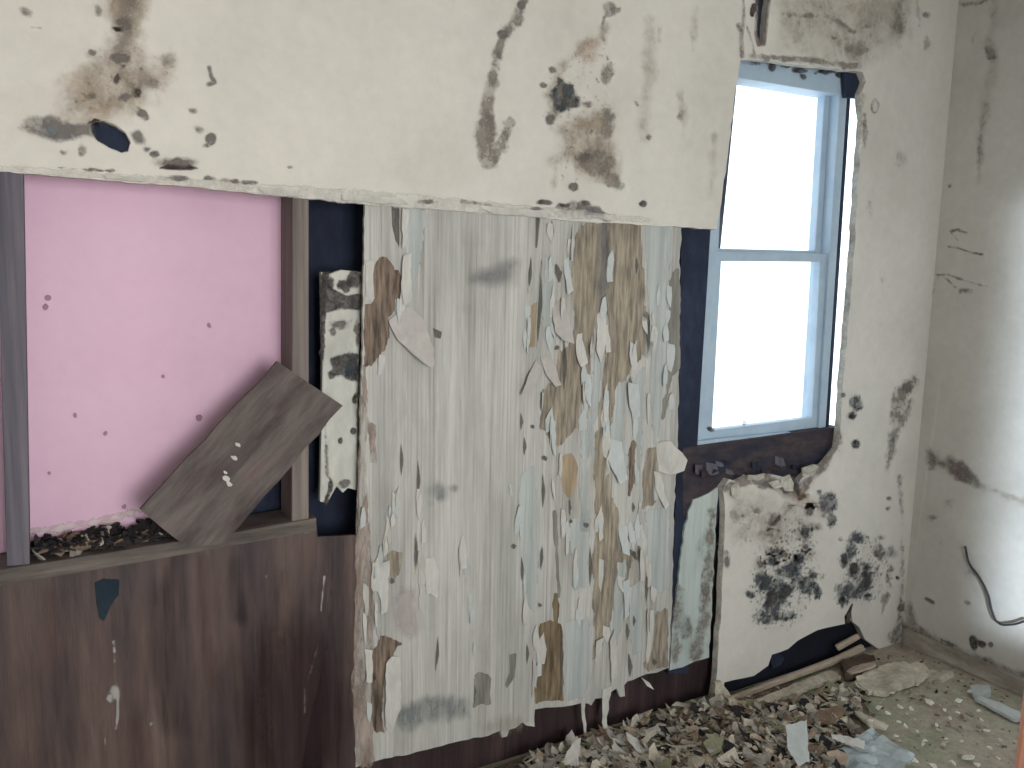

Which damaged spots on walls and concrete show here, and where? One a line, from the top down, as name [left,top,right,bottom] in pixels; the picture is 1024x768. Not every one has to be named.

water stain [25,117,91,156]
water stain [75,0,157,120]
water stain [133,131,159,157]
water stain [196,128,216,147]
water stain [476,0,527,167]
water stain [540,67,622,189]
peeling [0,158,687,768]
flaking render [722,450,833,499]
water stain [887,377,917,468]
water stain [928,451,977,482]
water stain [746,493,838,629]
water stain [838,531,902,608]